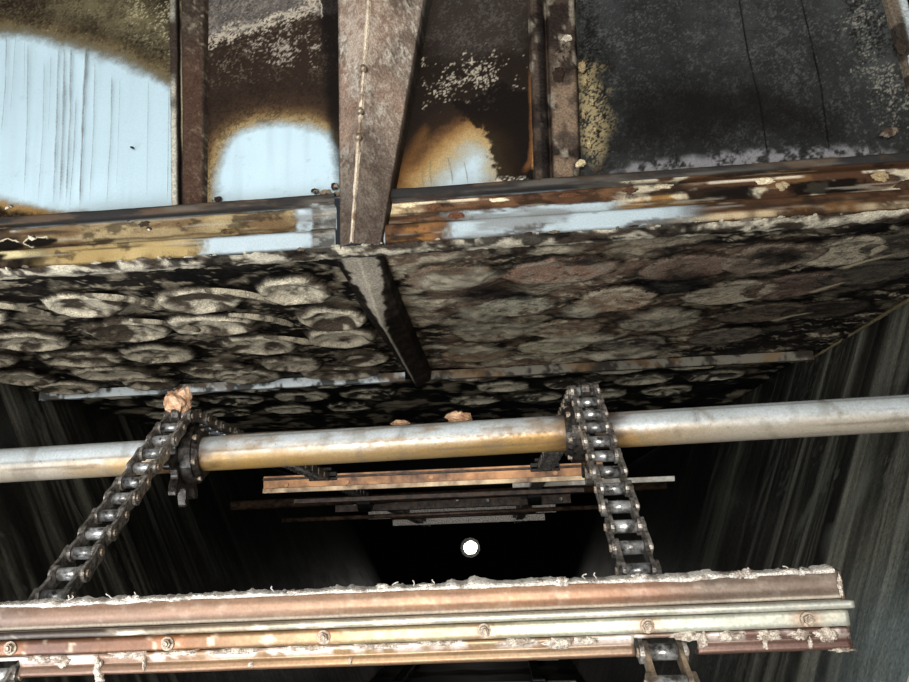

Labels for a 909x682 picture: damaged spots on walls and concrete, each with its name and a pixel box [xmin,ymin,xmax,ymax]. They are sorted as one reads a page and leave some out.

leakage [54,49,87,194]
peeling [755,177,790,191]
peeling [871,171,909,189]
peeling [398,203,465,219]